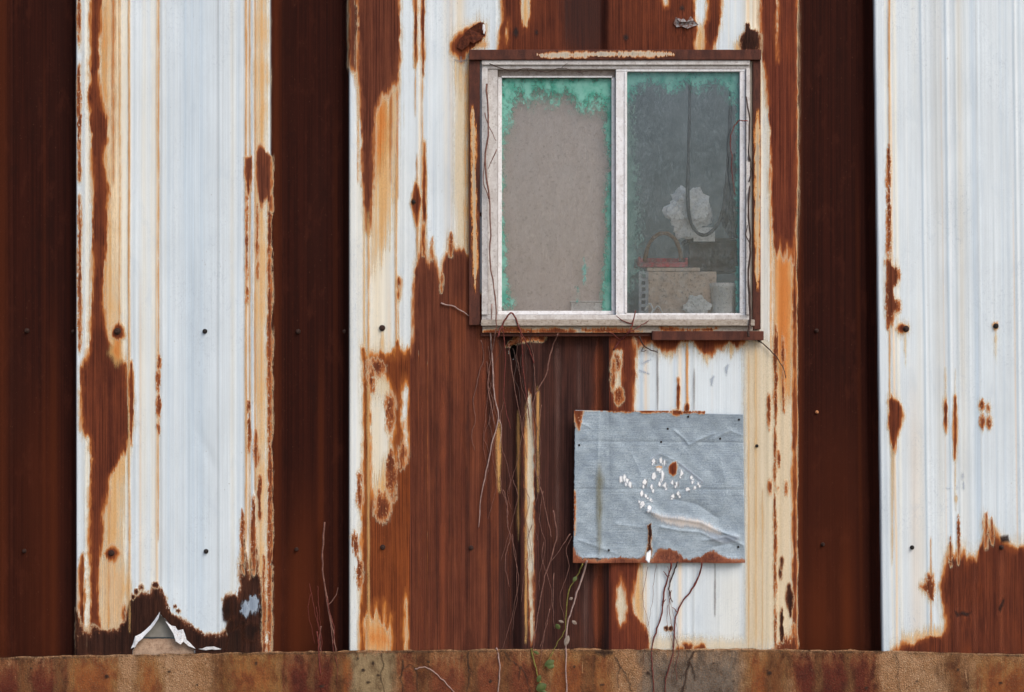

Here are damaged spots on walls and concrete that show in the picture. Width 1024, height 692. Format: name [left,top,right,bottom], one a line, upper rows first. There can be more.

rust [76,0,134,633]
rust [212,0,1024,692]